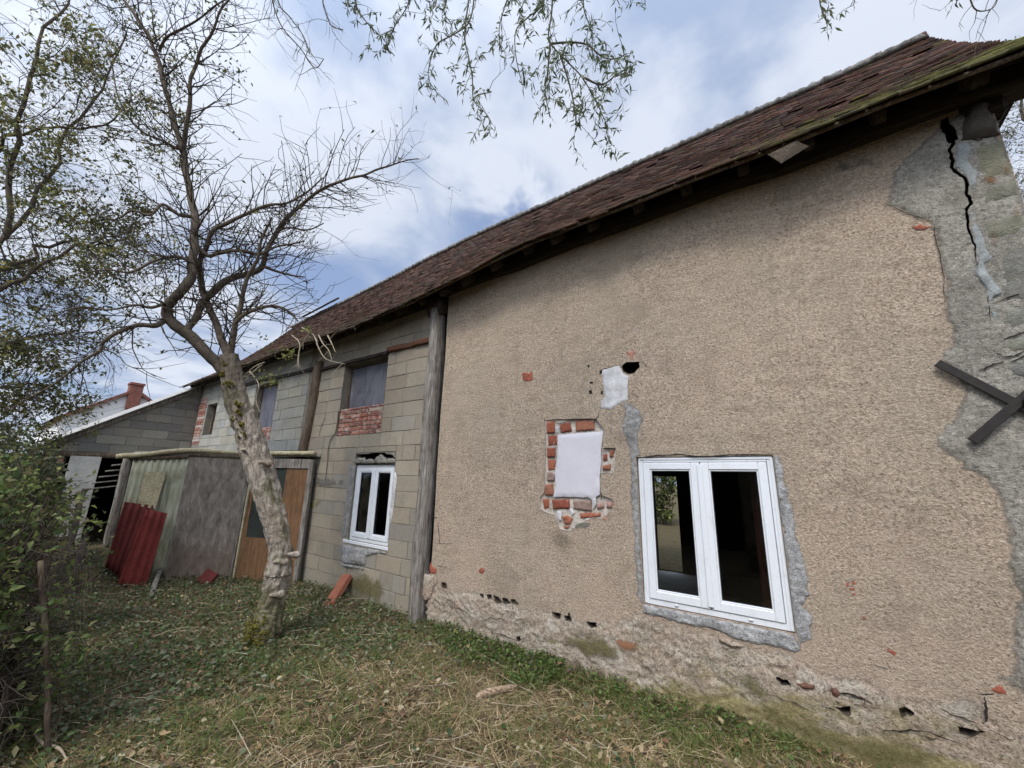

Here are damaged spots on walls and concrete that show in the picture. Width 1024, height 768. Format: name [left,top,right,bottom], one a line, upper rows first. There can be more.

crack [940,117,1003,265]
spalling [540,351,647,532]
spalling [422,563,1024,768]